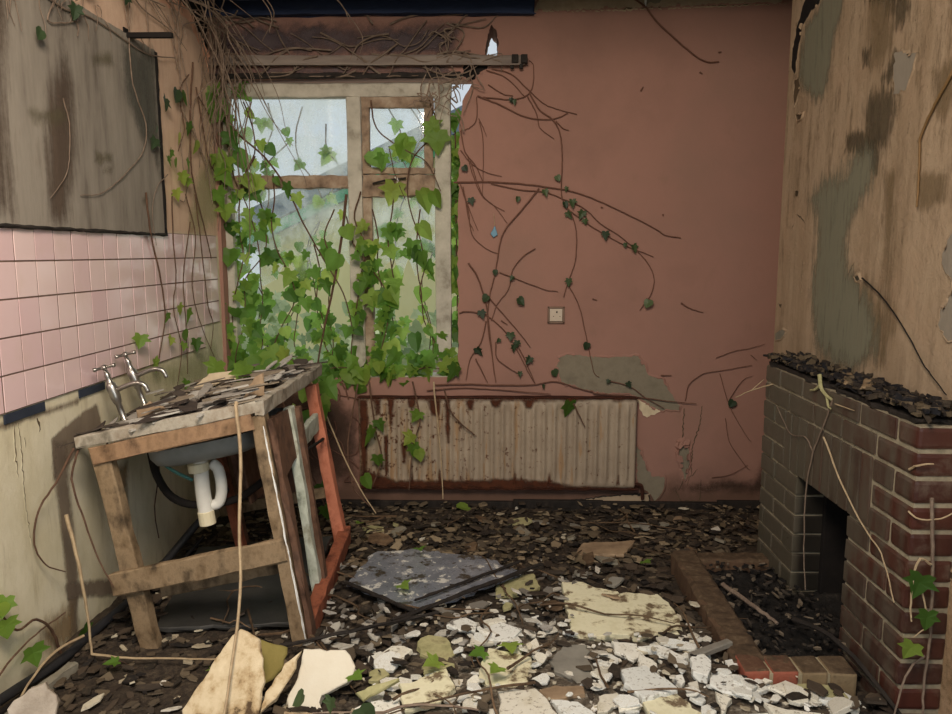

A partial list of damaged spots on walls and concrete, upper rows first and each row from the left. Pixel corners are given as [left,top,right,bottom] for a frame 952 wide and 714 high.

peeling [534,0,785,14]
peeling [791,0,842,123]
water stain [847,50,897,175]
water stain [869,0,911,30]
flaking render [936,232,952,344]
flaking render [554,352,683,419]